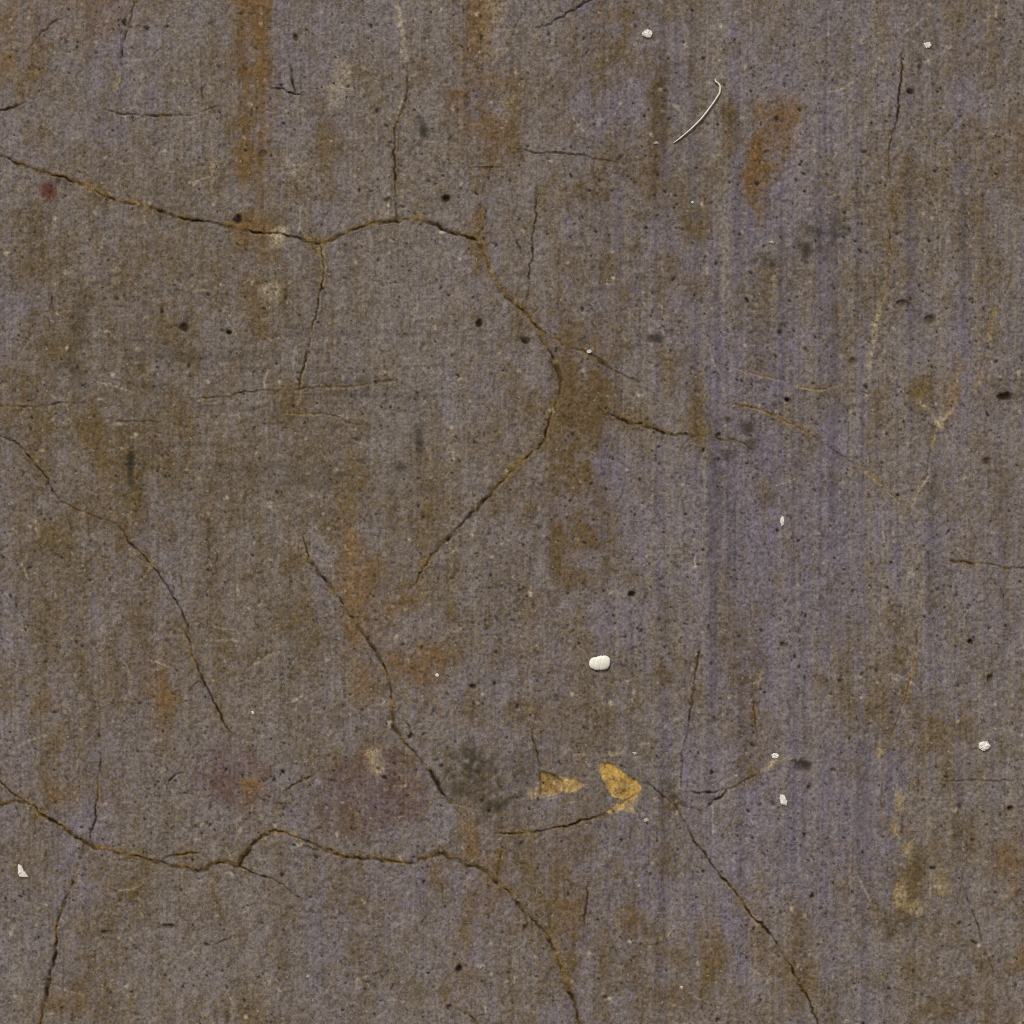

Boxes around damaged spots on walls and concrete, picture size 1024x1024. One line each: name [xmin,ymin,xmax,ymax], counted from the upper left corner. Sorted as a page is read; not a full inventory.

rust [216,0,288,269]
rust [735,87,810,231]
crack [0,0,642,594]
crack [596,404,756,451]
crack [0,399,233,736]
crack [298,527,458,807]
crack [0,643,822,1024]
spalling [526,771,586,801]
spalling [595,761,649,822]